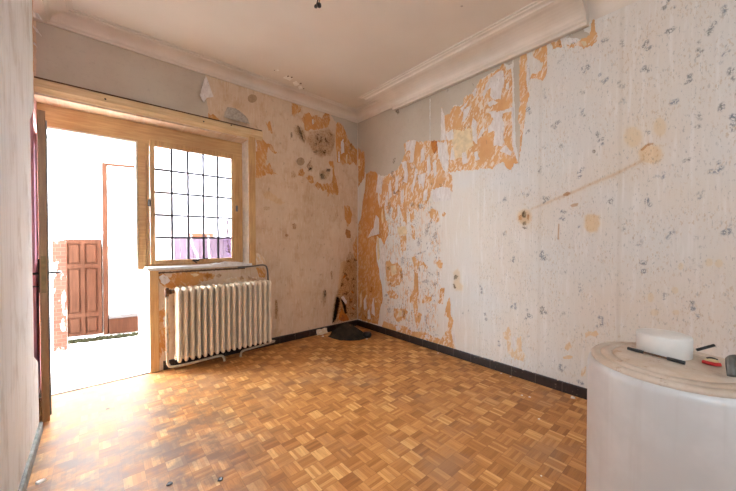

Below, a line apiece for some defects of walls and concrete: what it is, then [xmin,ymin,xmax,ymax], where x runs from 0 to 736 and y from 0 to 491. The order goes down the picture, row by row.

flaking render [331,57,530,282]
peeling [159,272,215,289]
peeling [360,291,377,320]